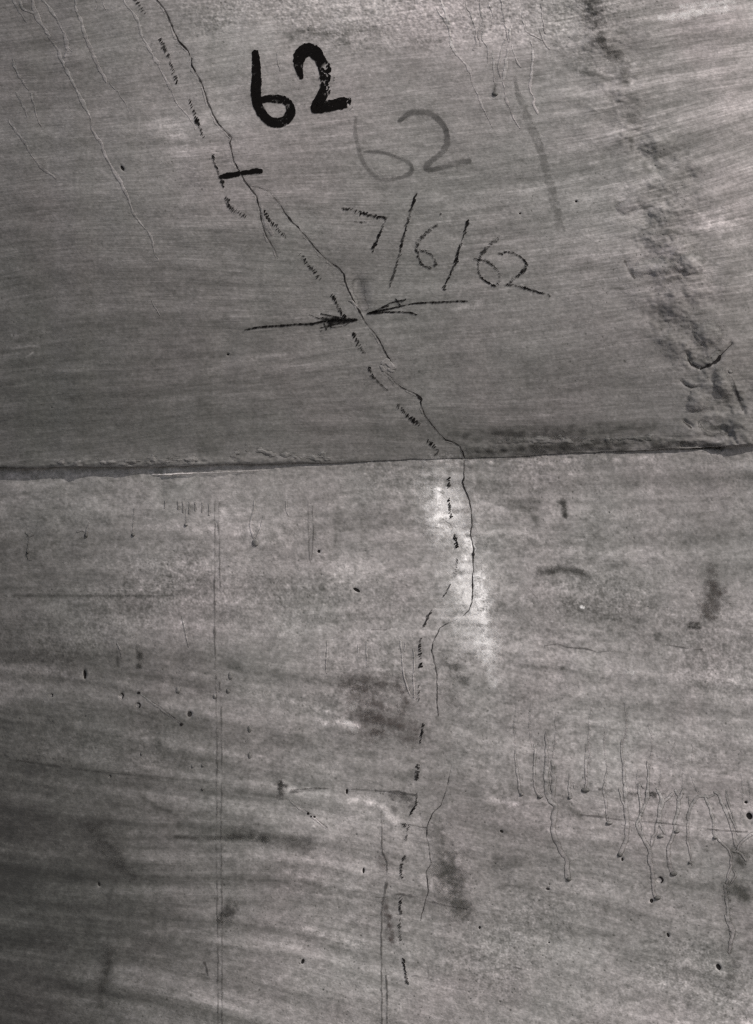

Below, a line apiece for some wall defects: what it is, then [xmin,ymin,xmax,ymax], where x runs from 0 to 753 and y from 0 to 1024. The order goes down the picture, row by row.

crack [157,0,475,716]
water stain [426,487,492,661]
water stain [513,703,592,881]
water stain [602,703,753,954]